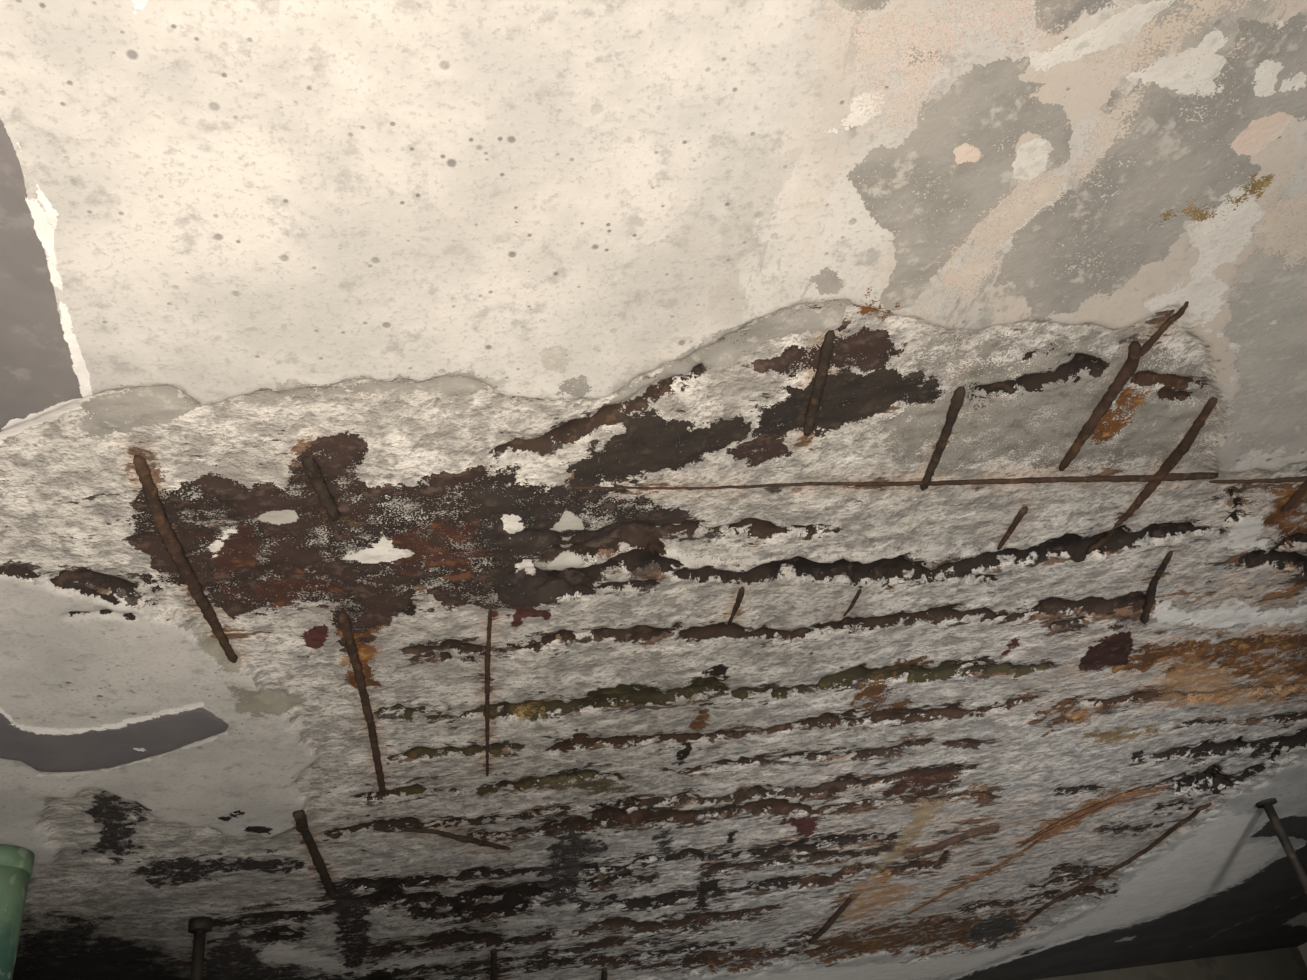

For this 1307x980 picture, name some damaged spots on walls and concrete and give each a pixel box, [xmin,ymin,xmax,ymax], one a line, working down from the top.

peeling [952,142,981,165]
peeling [809,267,844,295]
corrosion [125,287,945,692]
corrosion [1237,482,1307,546]
peeling [507,541,637,571]
corrosion [1078,617,1307,716]
peeling [0,701,229,777]
corrosion [1027,699,1159,747]
spalling [16,788,355,980]
corrosion [805,765,1037,968]
peeling [950,815,1307,980]
damp [252,944,457,975]